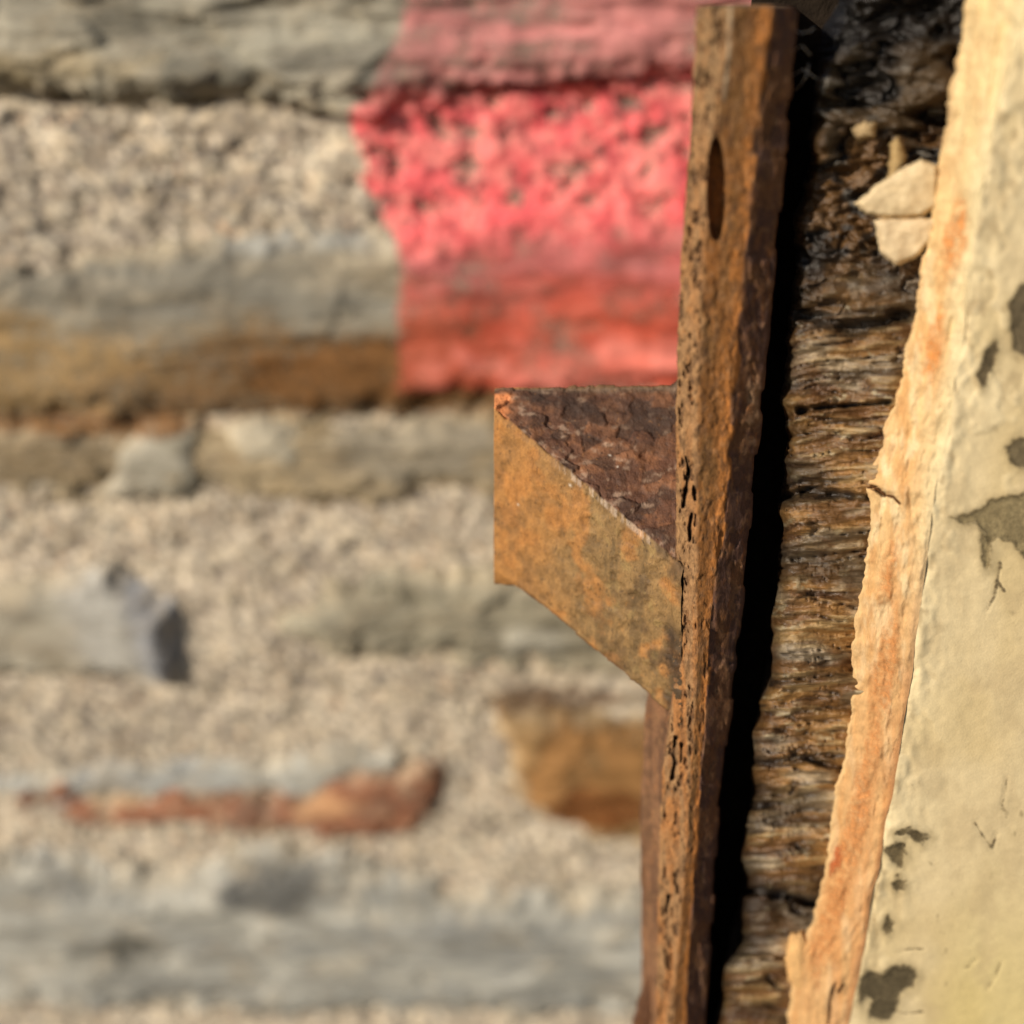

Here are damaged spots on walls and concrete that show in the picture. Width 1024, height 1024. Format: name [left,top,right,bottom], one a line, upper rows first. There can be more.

rust [632,976,652,1024]
spalling [785,0,1024,1024]